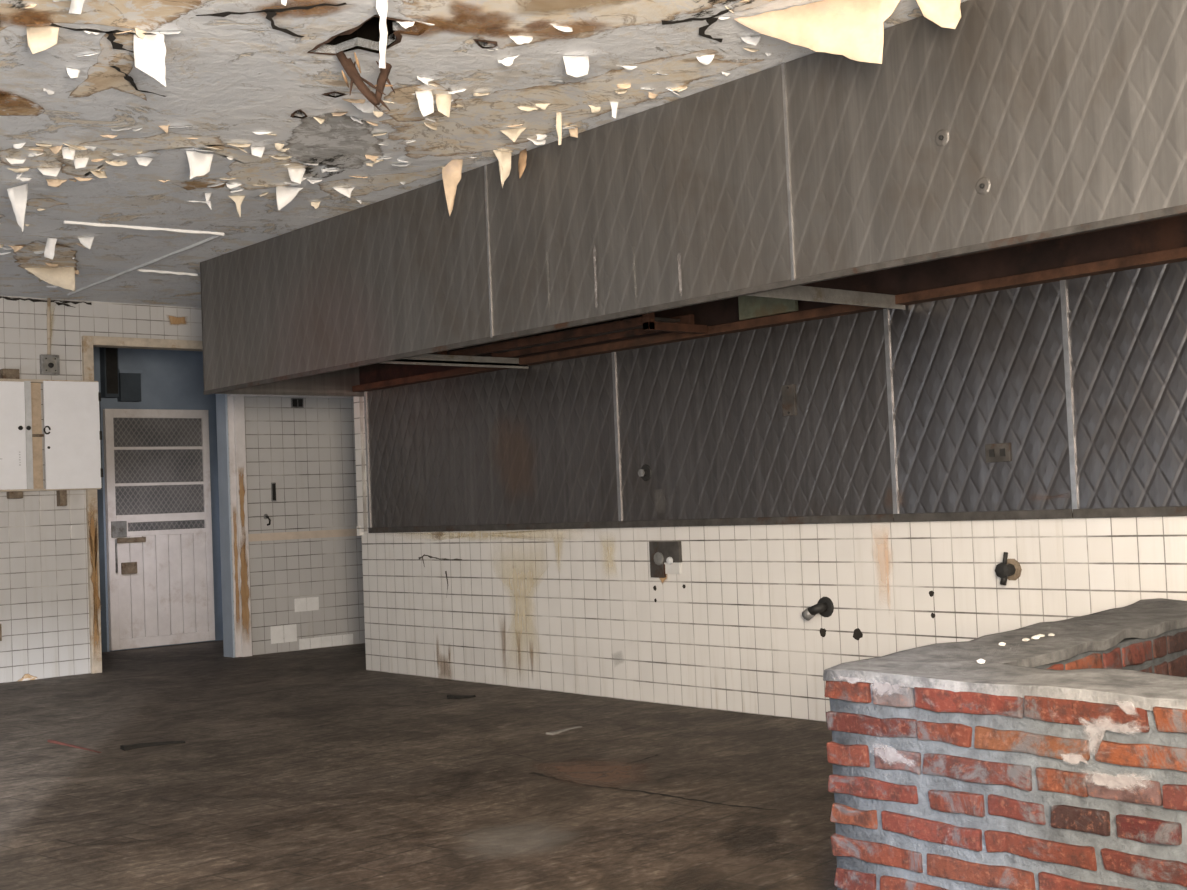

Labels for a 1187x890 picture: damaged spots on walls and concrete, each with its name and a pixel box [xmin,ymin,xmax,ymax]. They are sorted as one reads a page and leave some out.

water stain [527,0,601,11]
water stain [671,0,755,22]
peeling [916,0,961,29]
peeling [0,0,901,292]
crack [0,296,92,307]
corrosion [233,472,249,634]